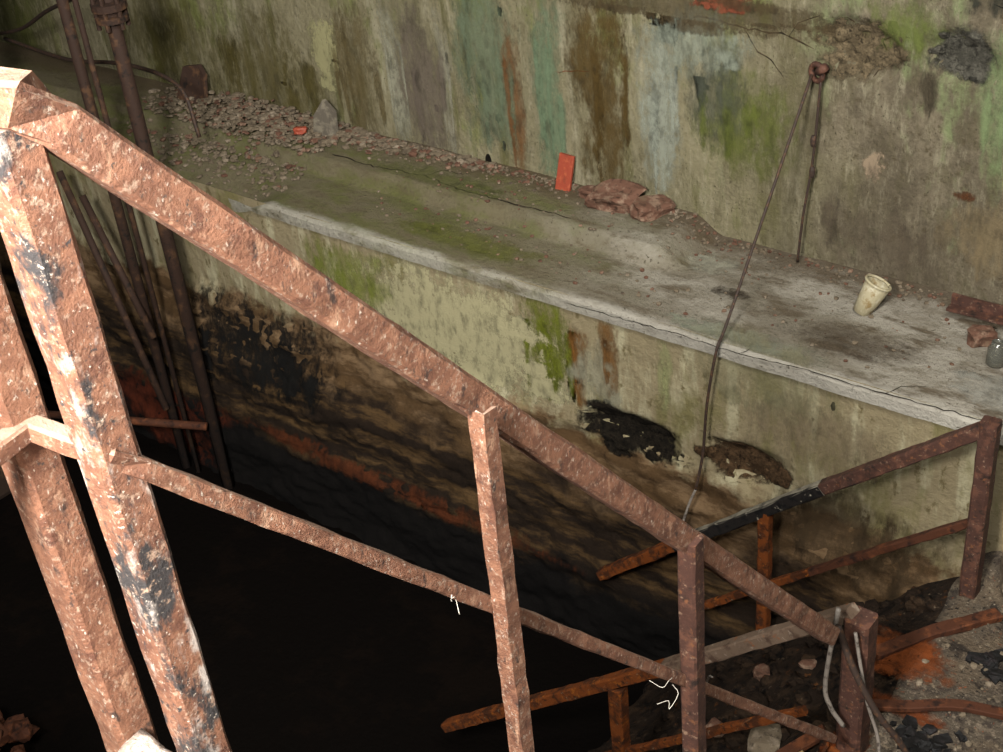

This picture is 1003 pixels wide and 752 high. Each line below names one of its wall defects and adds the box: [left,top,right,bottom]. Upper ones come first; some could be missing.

rust [503,38,526,165]
spalling [927,27,996,85]
spalling [0,232,54,391]
spalling [48,152,219,473]
leakage [192,286,332,414]
spalling [173,232,491,595]
spalling [186,179,954,529]
spalling [499,438,680,661]
spalling [704,568,756,647]
spalling [771,610,788,626]
spalling [771,441,977,612]
spalling [985,445,1003,553]